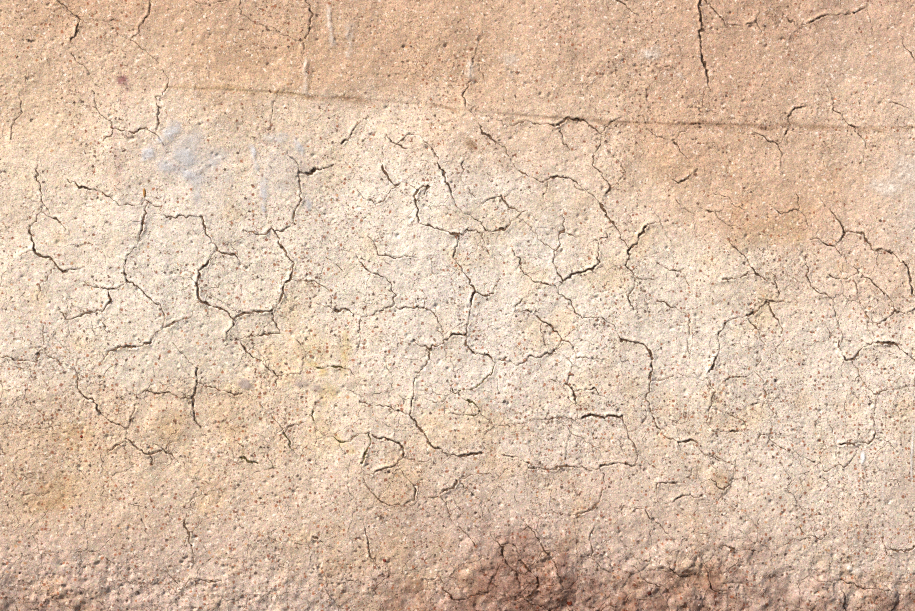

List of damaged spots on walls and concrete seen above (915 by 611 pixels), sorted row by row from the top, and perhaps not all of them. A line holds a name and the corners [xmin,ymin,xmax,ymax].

crack [57,0,169,146]
crack [195,0,313,73]
crack [643,0,915,472]
crack [1,32,736,611]
crack [633,545,757,611]
crack [810,574,900,611]
crack [882,532,915,559]